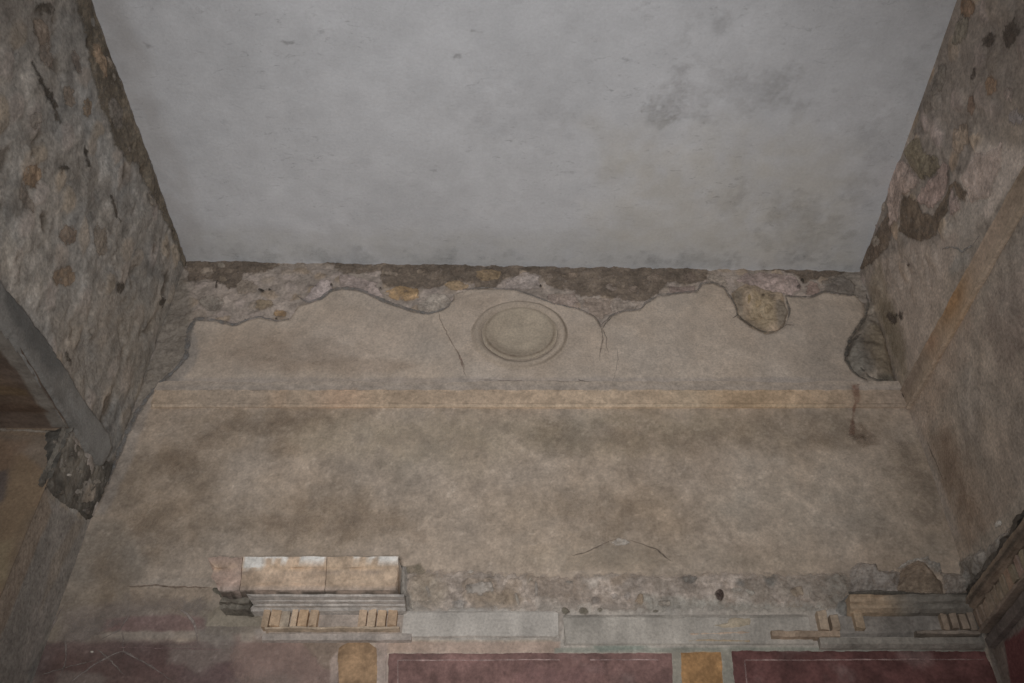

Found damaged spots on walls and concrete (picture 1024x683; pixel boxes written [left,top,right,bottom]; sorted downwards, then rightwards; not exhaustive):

spalling [78,0,967,437]
crack [439,314,522,381]
crack [469,281,751,382]
flaking render [38,425,115,520]